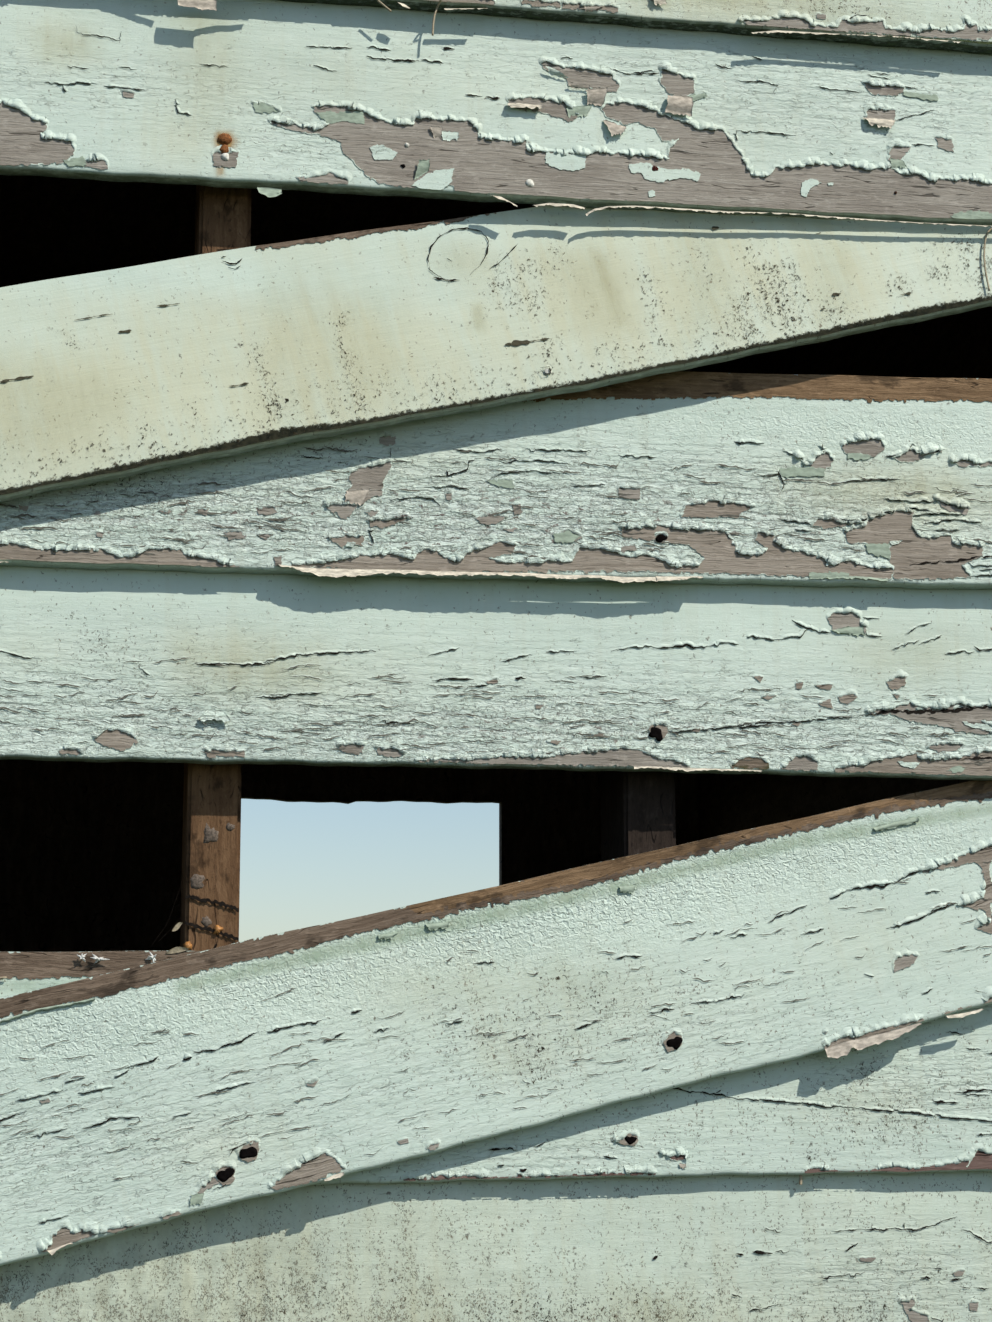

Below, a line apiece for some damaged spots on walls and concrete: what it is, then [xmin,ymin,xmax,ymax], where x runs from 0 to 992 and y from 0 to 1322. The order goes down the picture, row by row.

peeling [737,9,992,43]
peeling [0,98,109,171]
peeling [251,56,992,227]
peeling [0,429,992,583]
crack [0,616,992,765]
peeling [335,669,992,776]
crack [0,985,405,1190]
crack [364,867,992,1155]
peeling [821,1012,924,1058]
crack [488,1141,545,1172]
crack [737,1227,790,1256]
crack [818,1216,992,1279]